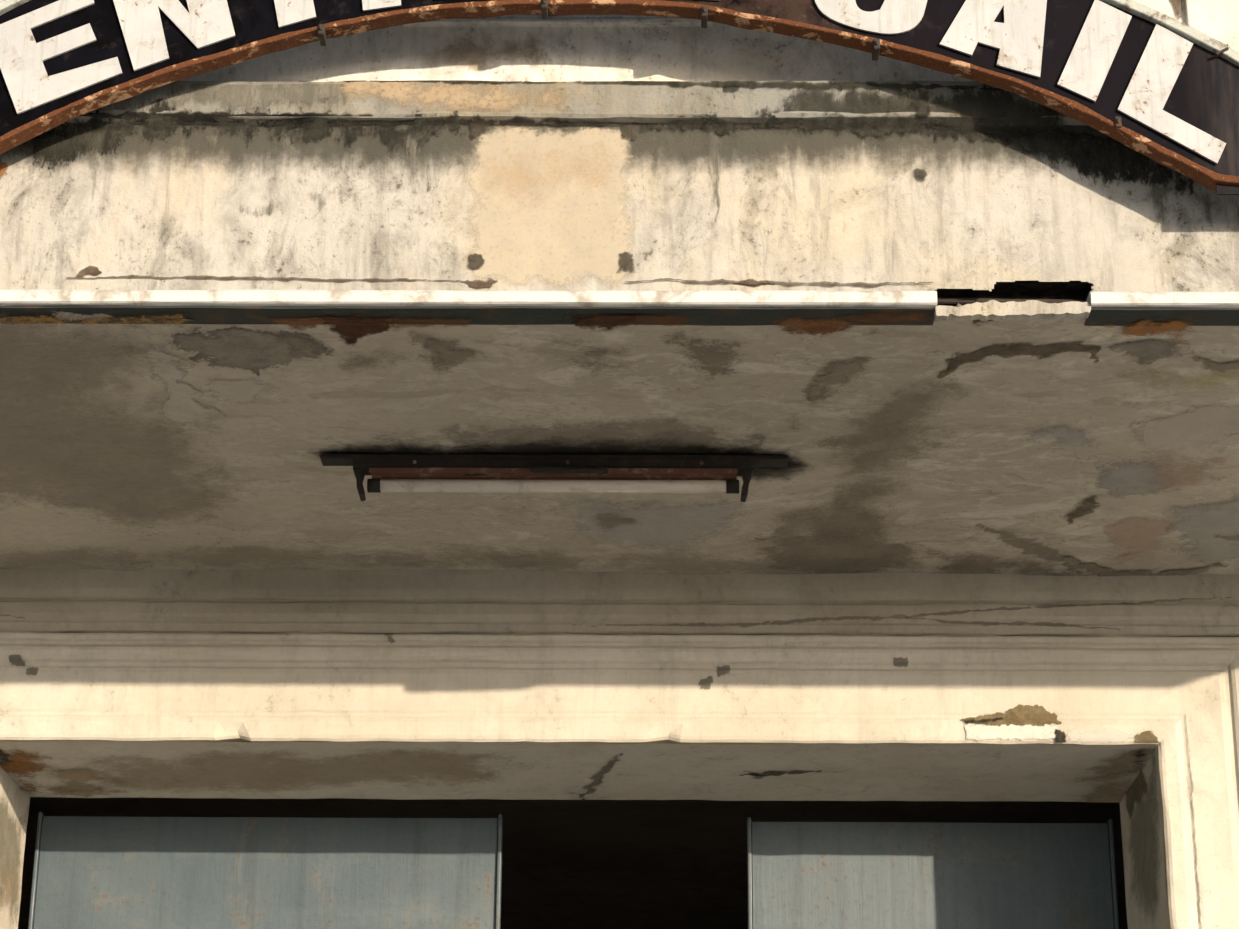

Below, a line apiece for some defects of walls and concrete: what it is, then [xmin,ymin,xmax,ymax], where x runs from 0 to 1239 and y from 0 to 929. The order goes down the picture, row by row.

damp [1171,0,1184,18]
corrosion [331,38,567,112]
corrosion [267,316,468,345]
corrosion [570,315,684,331]
corrosion [774,311,929,335]
spalling [934,282,1091,324]
peeling [139,327,334,424]
peeling [937,340,1239,378]
damp [756,382,955,574]
damp [928,553,1075,576]
peeling [960,704,1160,745]
crack [580,753,623,801]